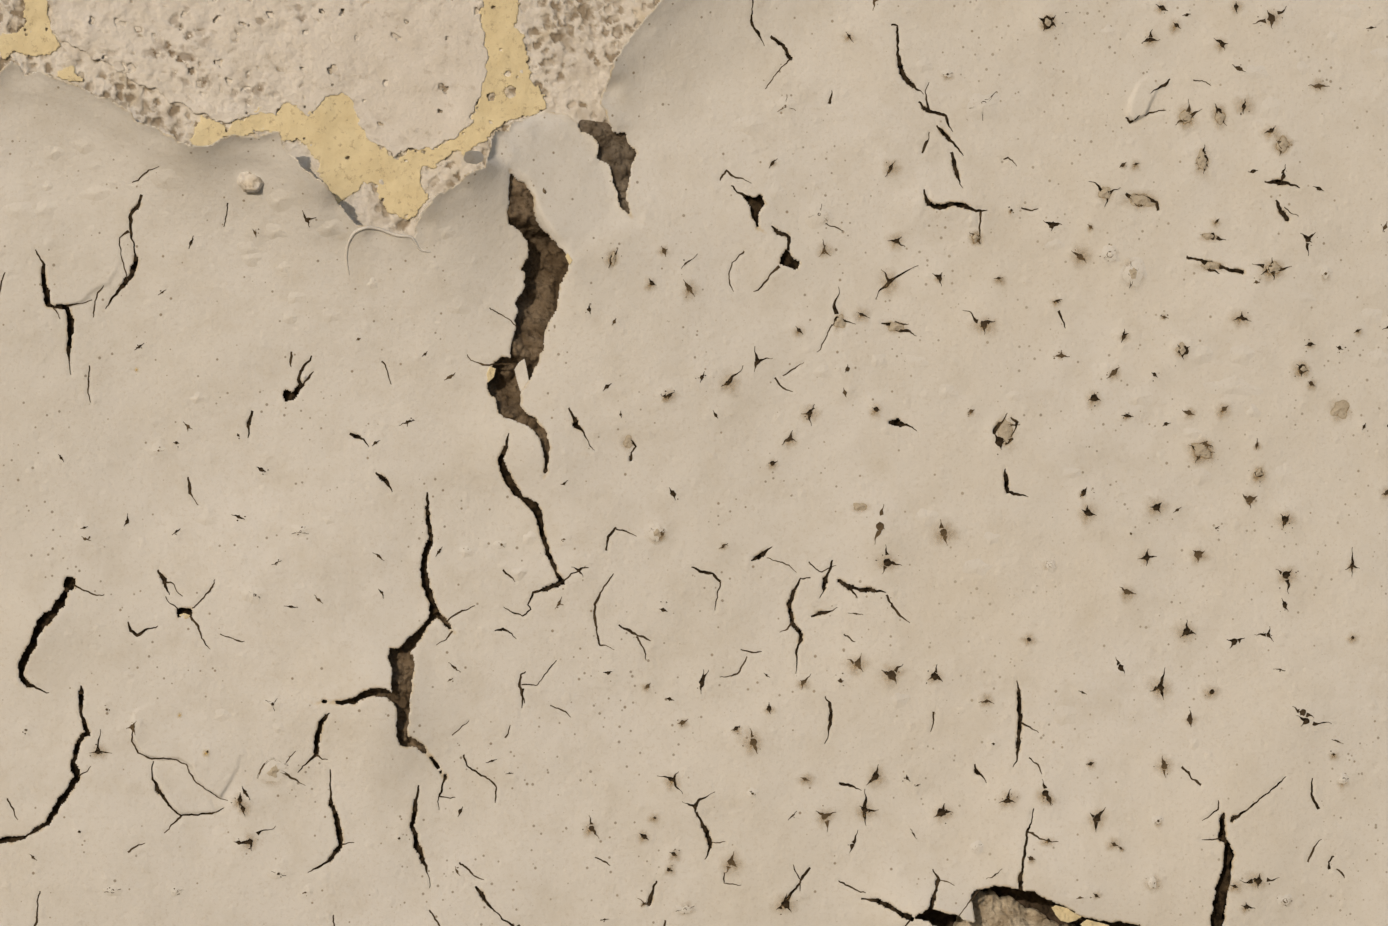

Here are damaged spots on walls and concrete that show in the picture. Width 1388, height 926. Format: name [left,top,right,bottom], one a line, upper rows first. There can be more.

crack [1039,12,1067,31]
peeling [0,0,660,237]
crack [578,120,636,214]
crack [1021,162,1159,288]
crack [661,237,995,466]
crack [0,159,953,926]
crack [1121,550,1157,595]
crack [1227,569,1299,671]
crack [1243,439,1293,533]
crack [1116,659,1215,725]
spalling [861,808,1140,926]
crack [1153,706,1349,926]